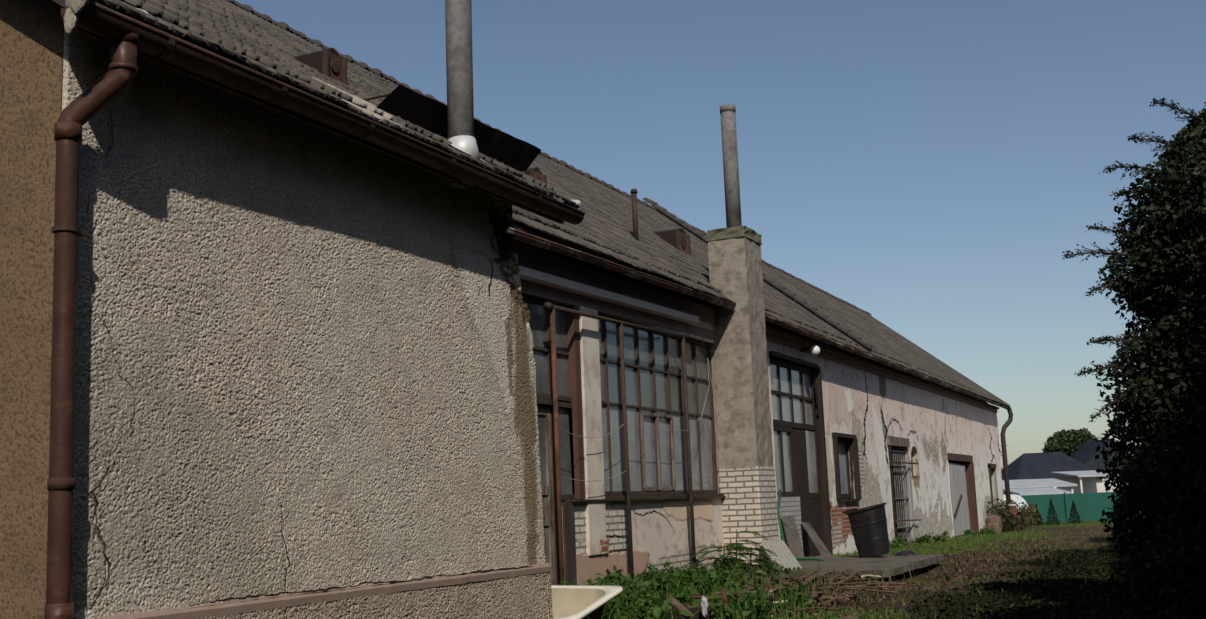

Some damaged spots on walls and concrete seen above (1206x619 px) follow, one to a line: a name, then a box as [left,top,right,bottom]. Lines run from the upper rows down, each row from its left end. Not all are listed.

crack [479,259,493,301]
crack [87,184,135,607]
crack [189,507,550,619]
water stain [505,302,537,566]
flaking render [574,502,715,585]
flaking render [660,498,713,521]
peeling [826,373,887,549]
crack [862,373,946,465]
peeling [911,425,952,540]